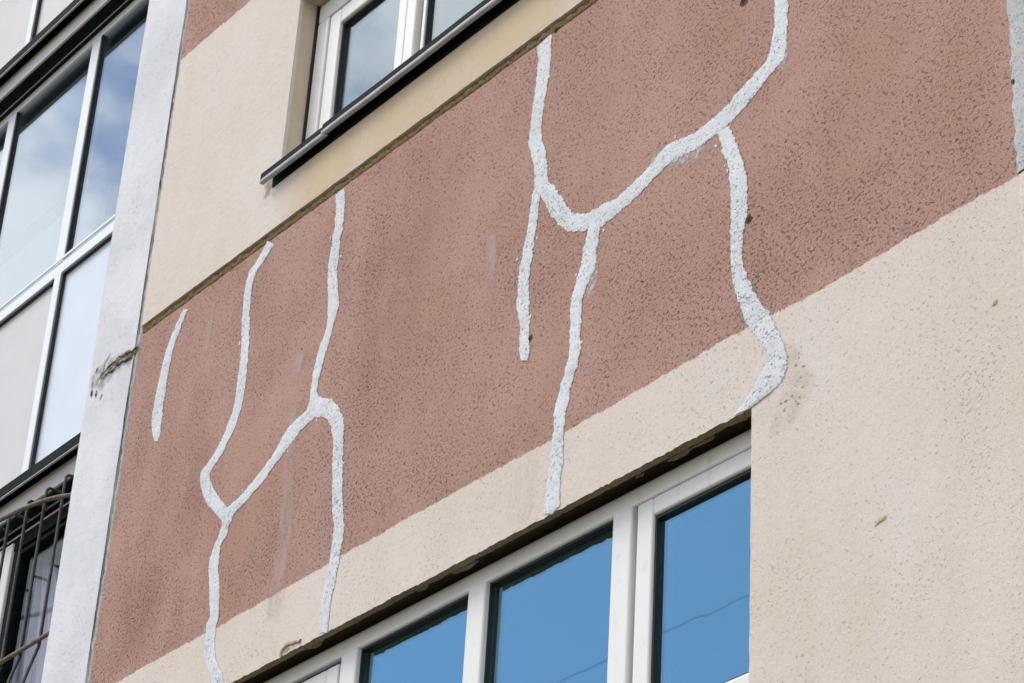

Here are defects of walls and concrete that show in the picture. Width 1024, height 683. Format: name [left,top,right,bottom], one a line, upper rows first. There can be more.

crack [158,44,181,193]
crack [114,225,154,485]
crack [151,309,188,441]
crack [200,189,345,683]
crack [516,0,792,514]
crack [87,511,111,666]